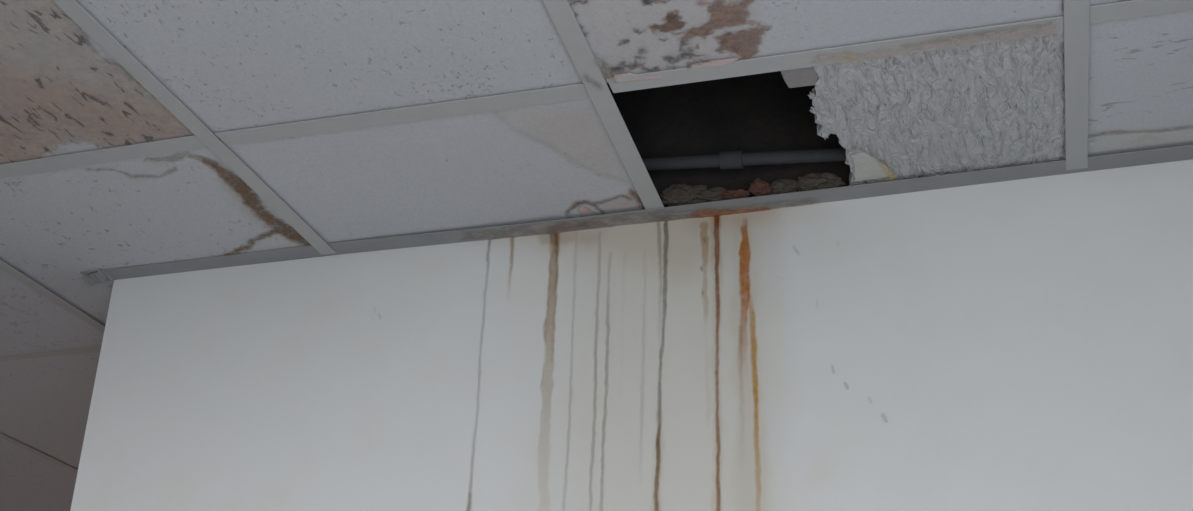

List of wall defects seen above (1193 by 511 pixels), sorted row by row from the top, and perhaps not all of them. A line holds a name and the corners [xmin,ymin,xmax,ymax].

damp [0,0,194,164]
peeling [603,0,770,82]
damp [146,154,311,256]